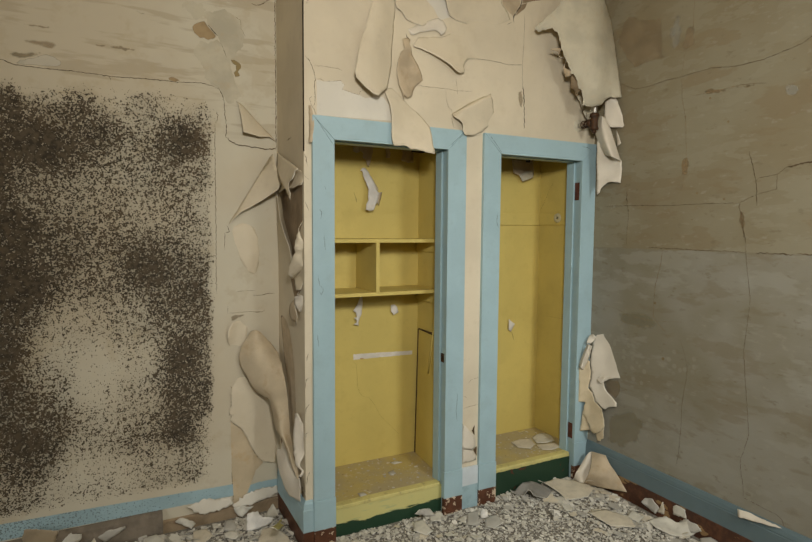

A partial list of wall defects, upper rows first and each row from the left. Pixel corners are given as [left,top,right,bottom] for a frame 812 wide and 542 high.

peeling [353,146,382,211]
peeling [308,0,435,163]
peeling [427,0,539,24]
peeling [512,159,534,182]
peeling [535,0,624,195]
damp [0,79,215,518]
peeling [175,153,305,542]
peeling [578,334,620,441]
crack [608,151,812,525]
peeling [142,534,165,542]